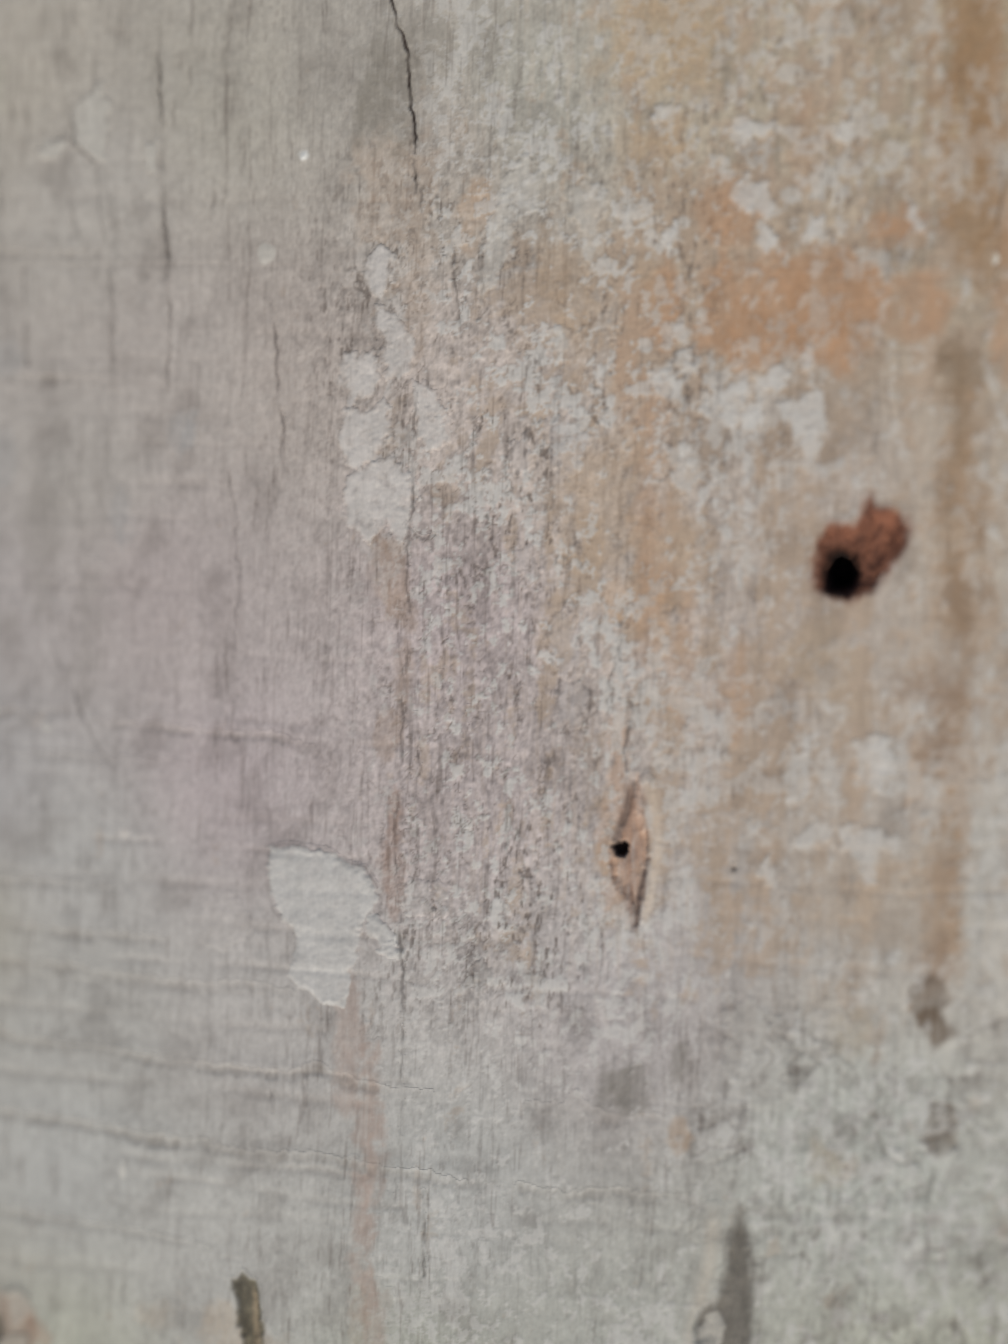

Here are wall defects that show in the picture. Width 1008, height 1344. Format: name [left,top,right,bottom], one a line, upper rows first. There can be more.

peeling [38,80,113,164]
crack [155,14,193,394]
crack [388,0,487,338]
peeling [335,242,453,549]
peeling [266,844,405,1009]
peeling [0,1288,34,1344]
spalling [228,1268,268,1344]
spalling [675,1200,761,1344]